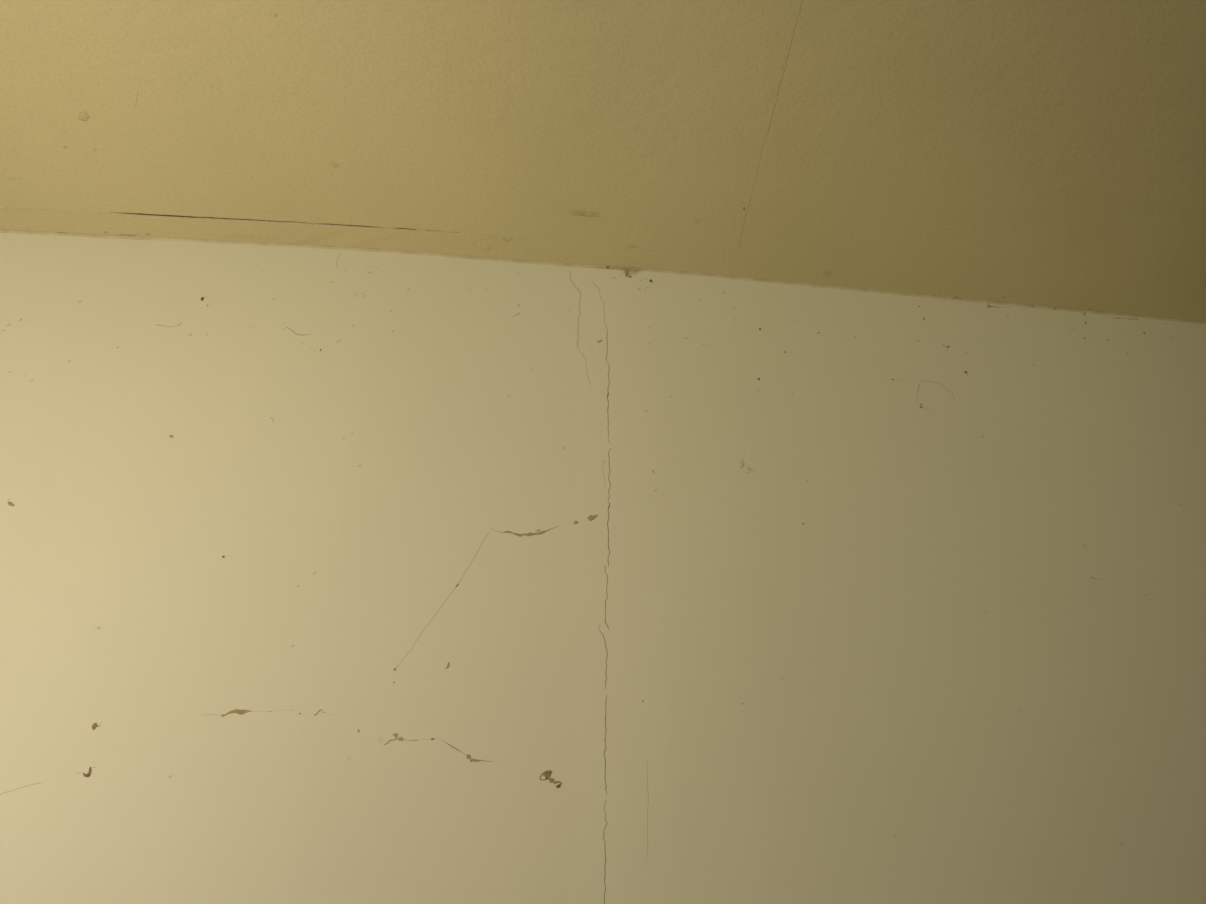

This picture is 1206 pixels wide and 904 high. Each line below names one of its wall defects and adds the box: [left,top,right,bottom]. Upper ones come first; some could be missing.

crack [25,209,477,235]
crack [503,331,611,904]
crack [221,709,250,717]
crack [358,730,490,762]